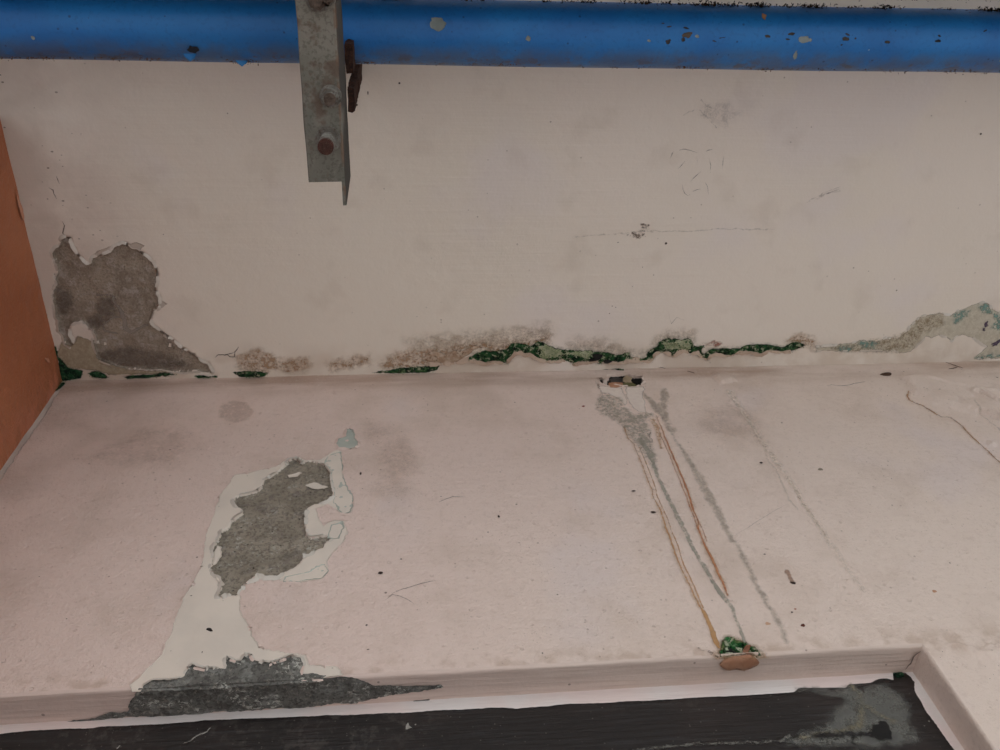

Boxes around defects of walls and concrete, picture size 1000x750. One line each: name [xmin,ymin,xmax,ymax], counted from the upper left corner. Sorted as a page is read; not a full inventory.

peeling [45,235,215,375]
spalling [596,375,646,412]
peeling [815,301,1000,360]
peeling [68,428,443,722]
damp [597,395,746,642]
rust [624,419,728,648]